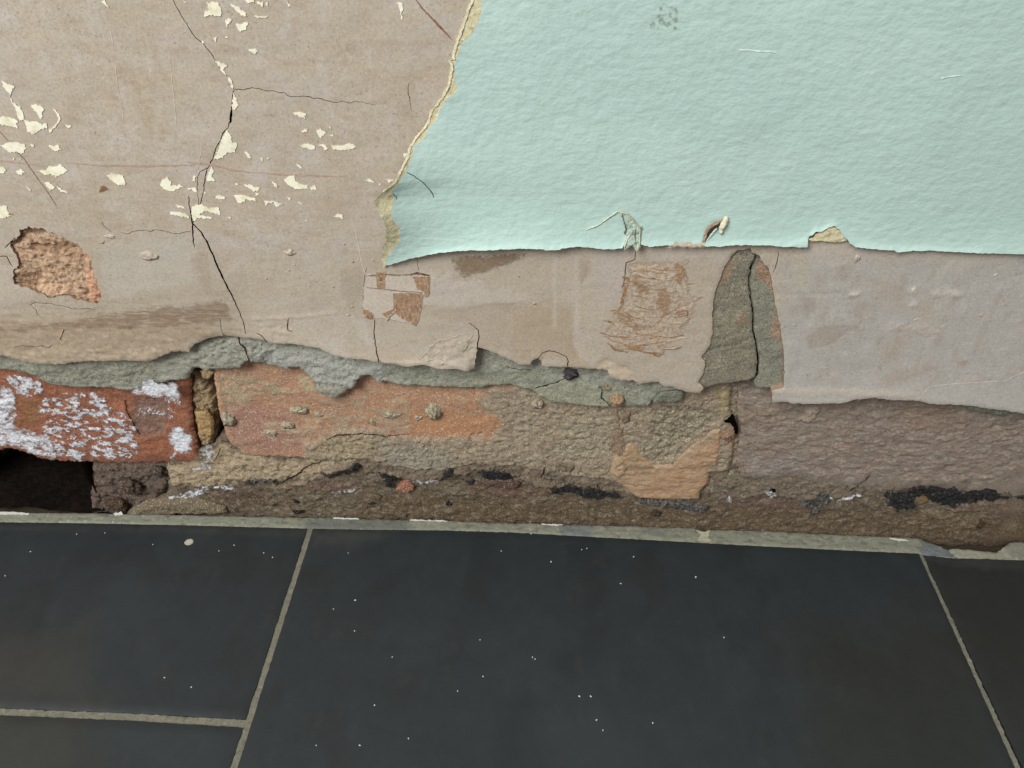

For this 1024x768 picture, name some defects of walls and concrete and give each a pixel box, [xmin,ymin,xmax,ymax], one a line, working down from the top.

peeling [201,0,269,43]
peeling [0,81,71,193]
crack [101,0,373,361]
peeling [160,130,317,221]
spalling [11,227,101,302]
peeling [362,272,430,326]
spalling [699,248,783,388]
crack [749,251,779,374]
flaking render [0,335,684,407]
damp [0,375,214,471]
spalling [724,414,738,434]
spalling [0,447,105,512]